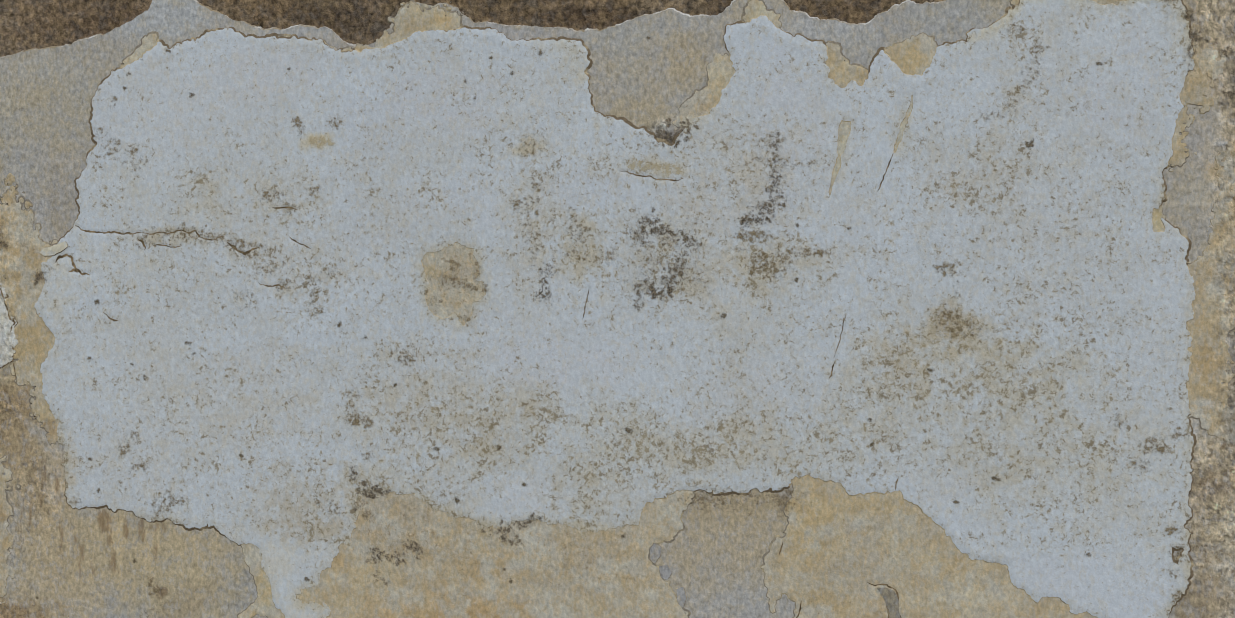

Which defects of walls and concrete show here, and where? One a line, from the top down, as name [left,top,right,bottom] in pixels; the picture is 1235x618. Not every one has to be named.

crack [55,225,259,275]
crack [273,207,311,249]
spalling [0,0,1020,453]
peeling [1152,0,1235,618]
peeling [295,475,1098,618]